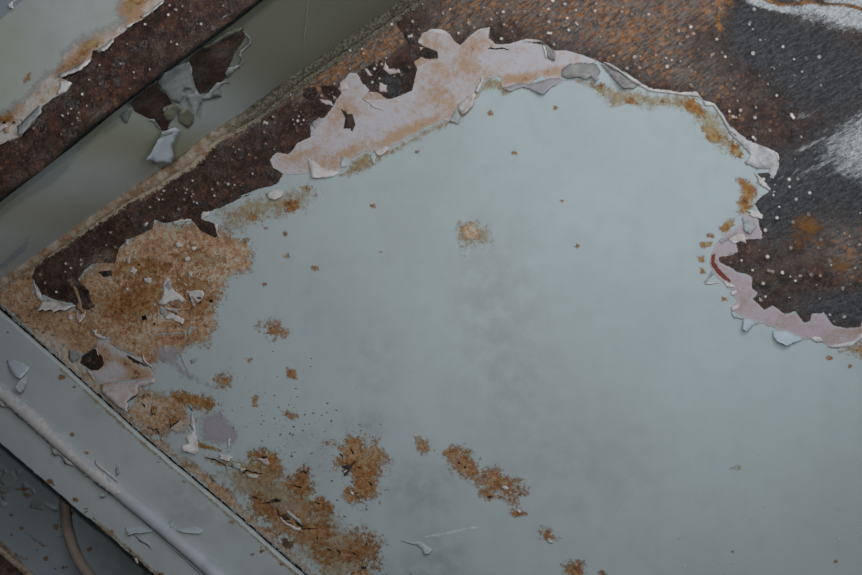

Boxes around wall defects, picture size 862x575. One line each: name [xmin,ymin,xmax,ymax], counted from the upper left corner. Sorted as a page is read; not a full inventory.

peeling [0,0,164,144]
peeling [146,127,181,165]
peeling [270,27,780,191]
rust [397,0,862,328]
rust [0,0,438,575]
peeling [705,210,862,348]
peeling [0,360,122,498]
rust [443,445,528,517]
rust [560,559,585,575]